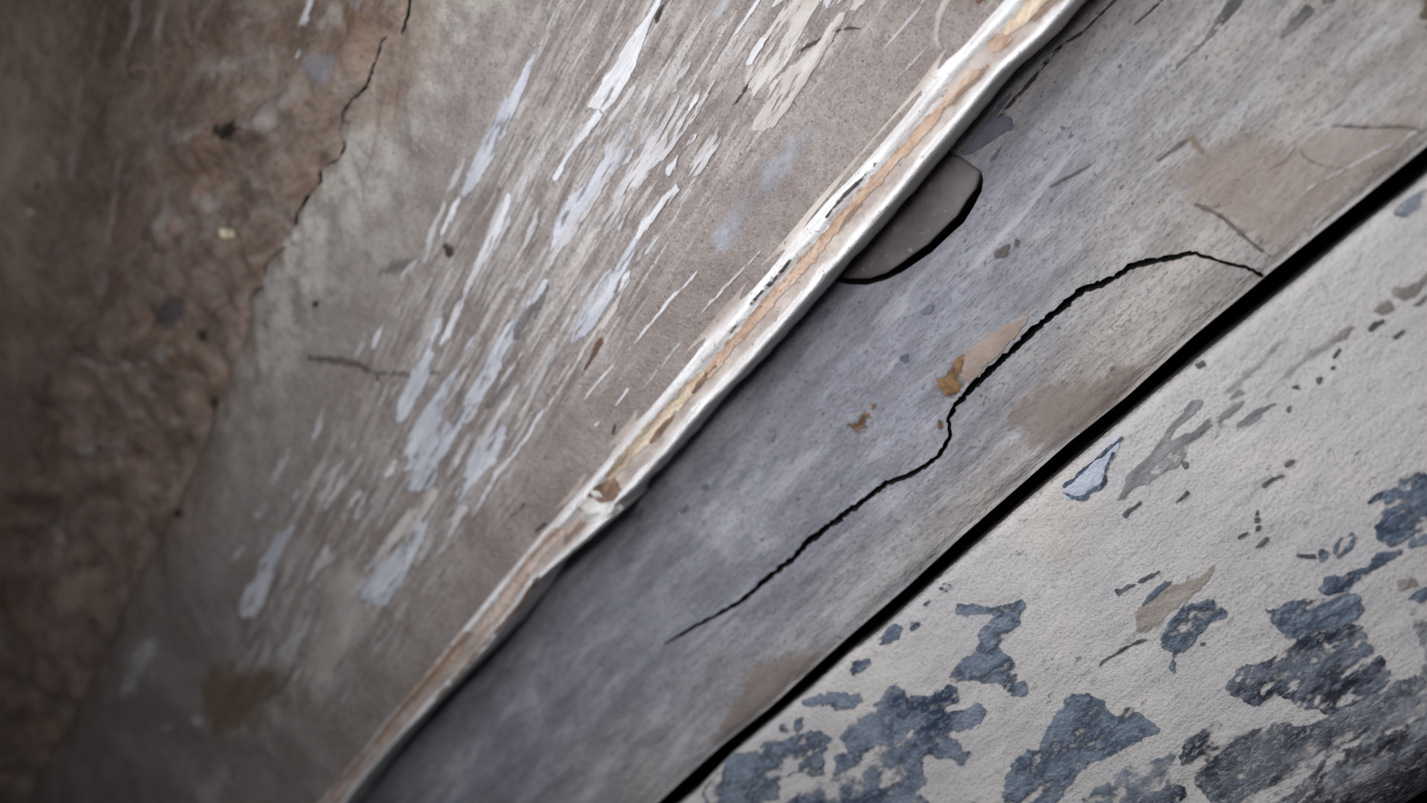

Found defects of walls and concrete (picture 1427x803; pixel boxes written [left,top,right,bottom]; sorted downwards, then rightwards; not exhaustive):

crack [248,0,411,300]
crack [825,162,876,218]
peeling [1393,189,1426,217]
spalling [322,0,1060,803]
corrosion [936,355,965,397]
crack [668,204,1269,643]
peeling [1062,273,1427,518]
peeling [1001,471,1427,803]